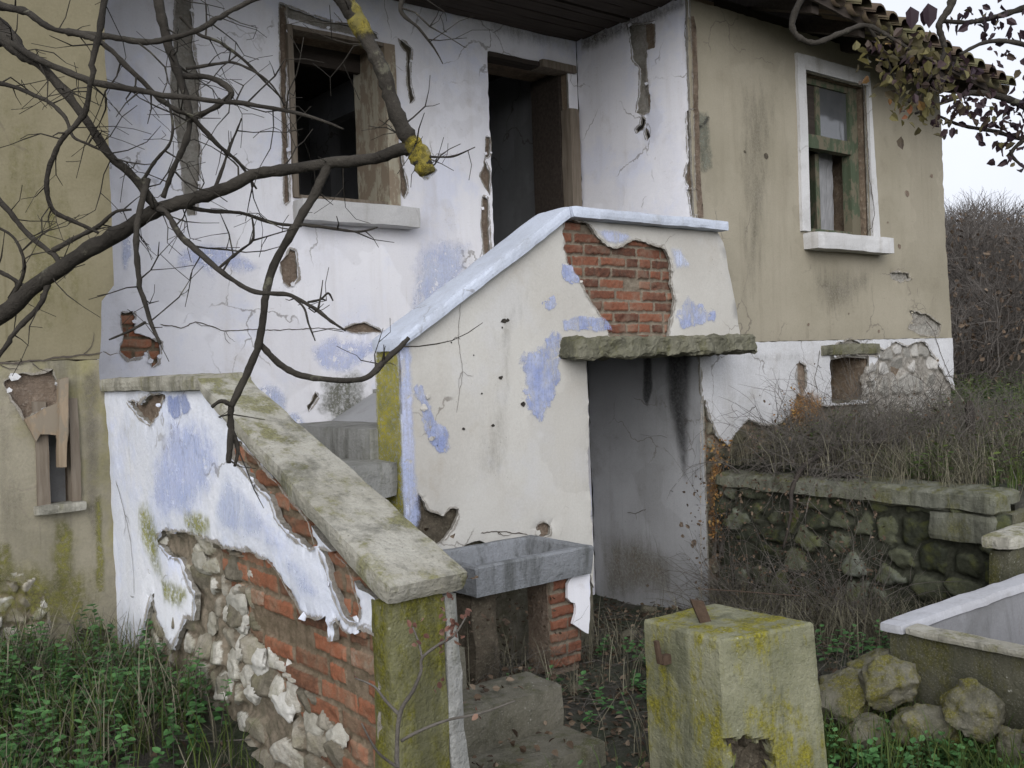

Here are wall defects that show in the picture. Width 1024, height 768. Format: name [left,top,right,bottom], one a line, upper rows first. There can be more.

flaking render [627,21,656,140]
flaking render [280,247,301,287]
flaking render [119,311,163,368]
flaking render [344,321,383,334]
flaking render [521,219,716,421]
flaking render [830,310,964,401]
flaking render [4,369,57,420]
flaking render [127,393,165,426]
flaking render [413,493,460,543]
spalling [110,441,382,768]